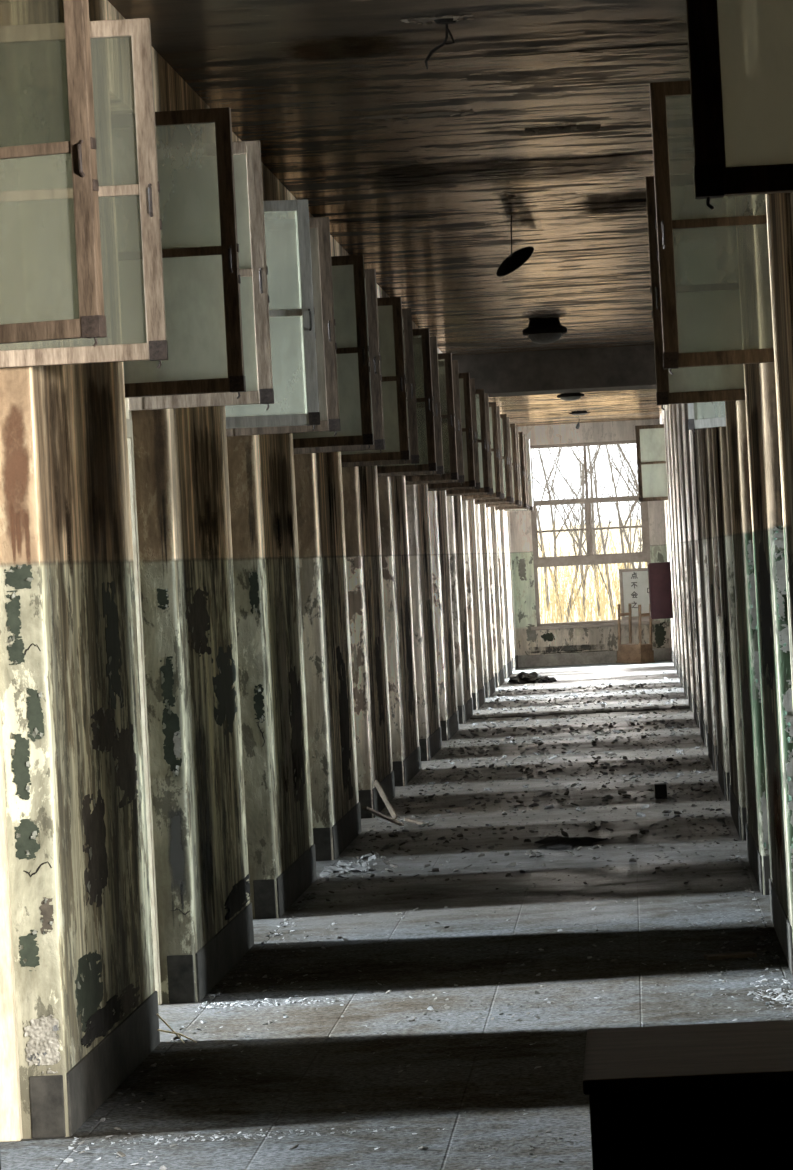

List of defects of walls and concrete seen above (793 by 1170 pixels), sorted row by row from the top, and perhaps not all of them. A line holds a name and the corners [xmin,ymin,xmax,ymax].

peeling [4,564,34,665]
peeling [11,688,44,800]
peeling [91,581,138,808]
peeling [157,588,169,610]
peeling [160,656,182,777]
peeling [185,586,238,735]
peeling [248,569,260,615]
peeling [253,684,265,723]
peeling [288,659,305,811]
peeling [683,526,793,872]
peeling [14,819,41,860]
peeling [82,789,108,914]